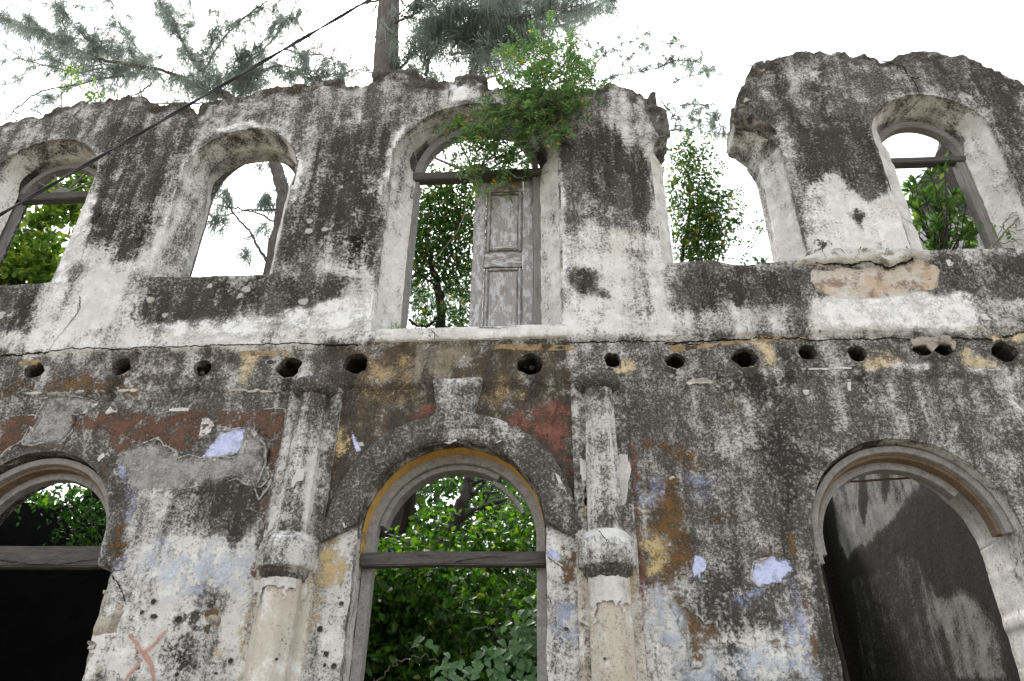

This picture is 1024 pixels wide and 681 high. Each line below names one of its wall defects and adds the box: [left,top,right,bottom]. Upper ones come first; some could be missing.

crack [0,296,358,358]
damp [127,114,409,340]
damp [559,123,652,220]
damp [766,58,899,217]
flaking render [810,260,954,300]
damp [922,56,1024,181]
flaking render [0,390,308,606]
peeling [505,401,587,516]
damp [714,338,840,678]
peeling [750,555,793,587]